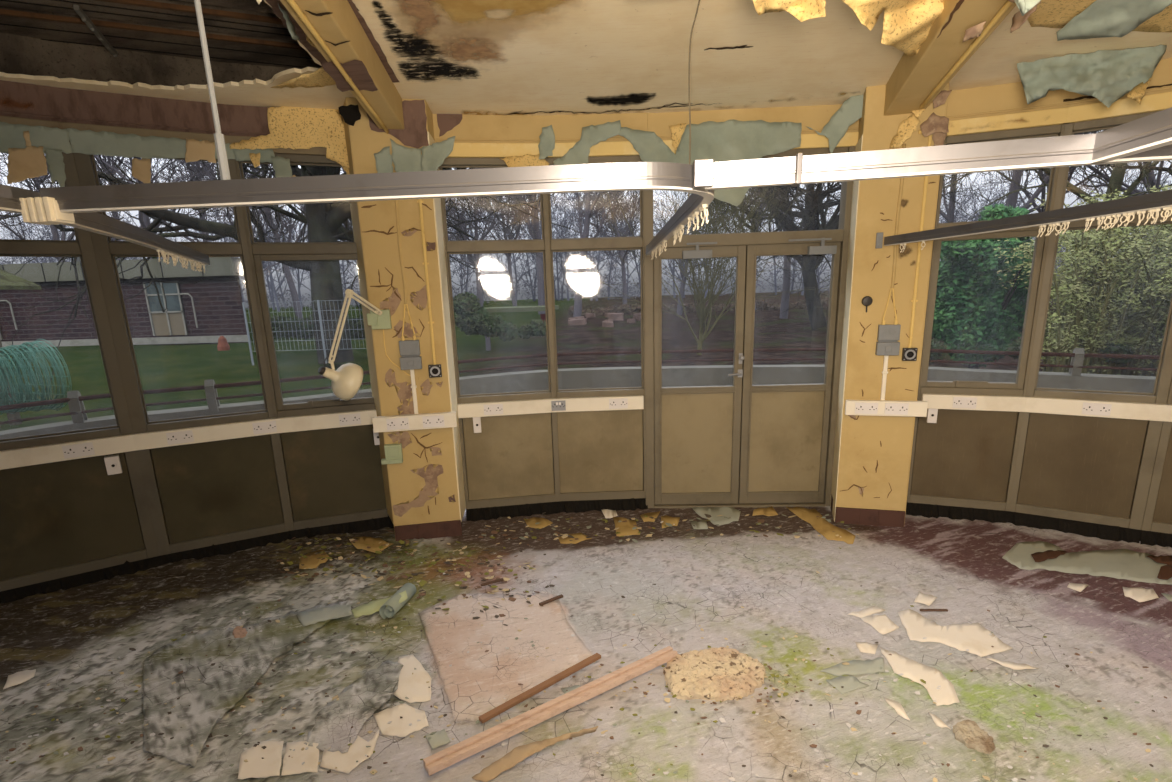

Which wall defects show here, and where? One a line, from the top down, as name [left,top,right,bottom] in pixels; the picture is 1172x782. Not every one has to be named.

water stain [373,0,563,81]
crack [361,203,432,235]
crack [370,266,425,338]
peeling [387,432,412,449]
crack [411,433,442,462]
peeling [393,447,456,517]
peeling [1067,583,1089,592]
peeling [1123,587,1172,602]